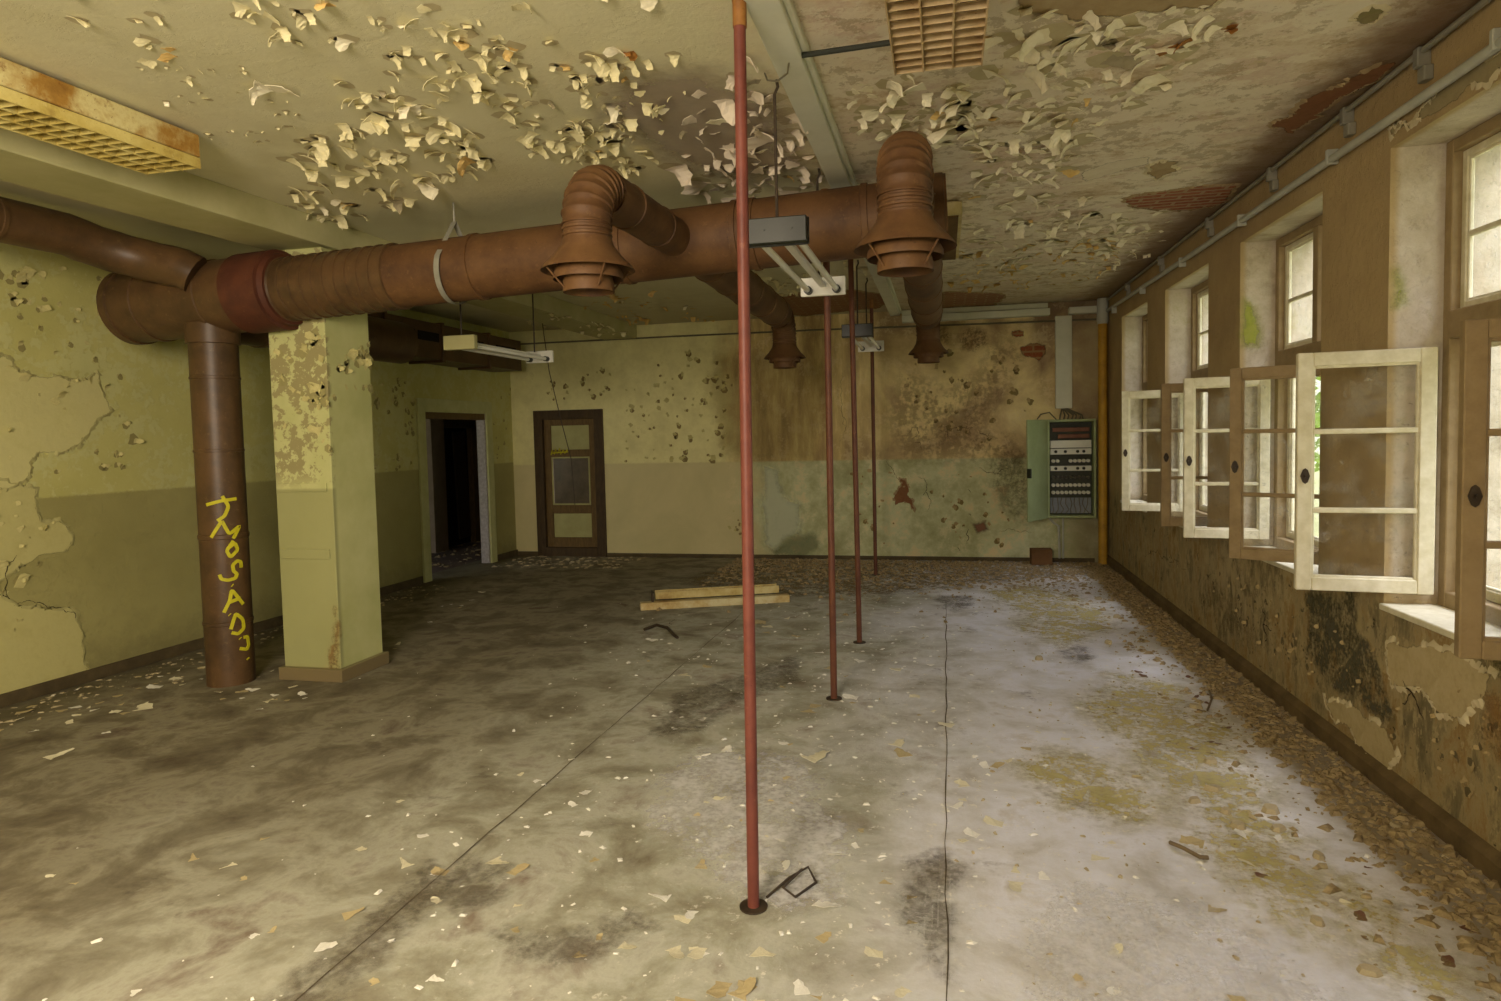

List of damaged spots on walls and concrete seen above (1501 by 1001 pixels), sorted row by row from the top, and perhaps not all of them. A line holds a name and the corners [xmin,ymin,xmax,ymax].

flaking render [1348,4,1392,24]
flaking render [1267,62,1395,133]
flaking render [845,0,1241,308]
peeling [0,266,100,332]
flaking render [761,261,885,317]
leakage [762,468,799,549]
flaking render [849,469,965,544]
leakage [1305,592,1392,720]